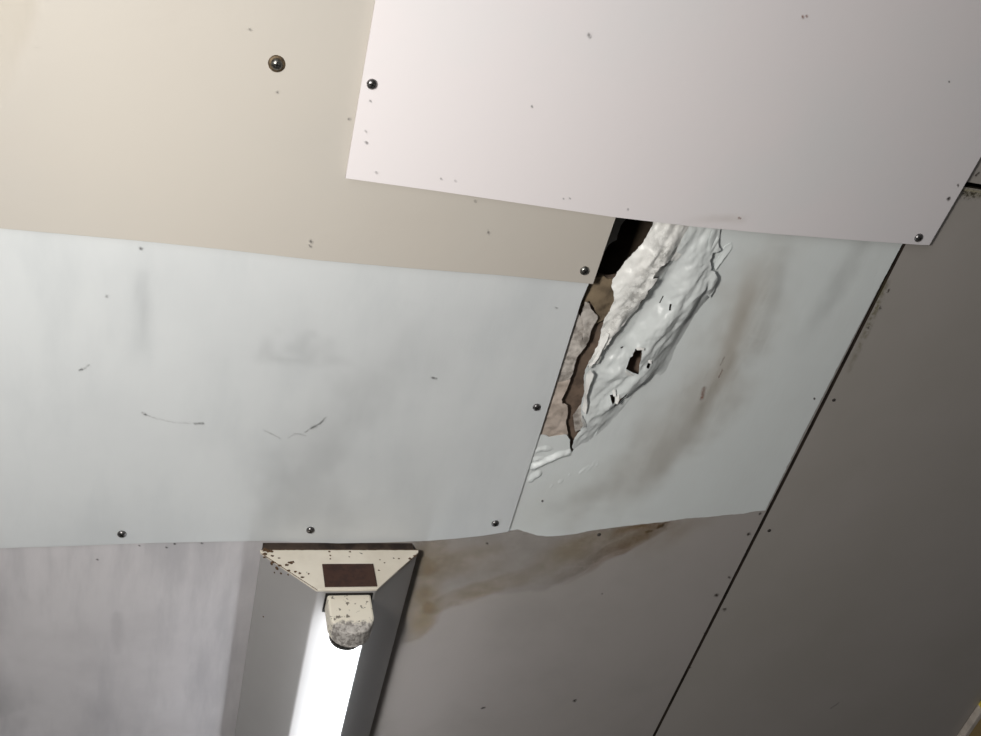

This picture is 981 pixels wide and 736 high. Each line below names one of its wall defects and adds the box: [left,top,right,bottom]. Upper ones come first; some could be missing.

spalling [540,222,701,452]